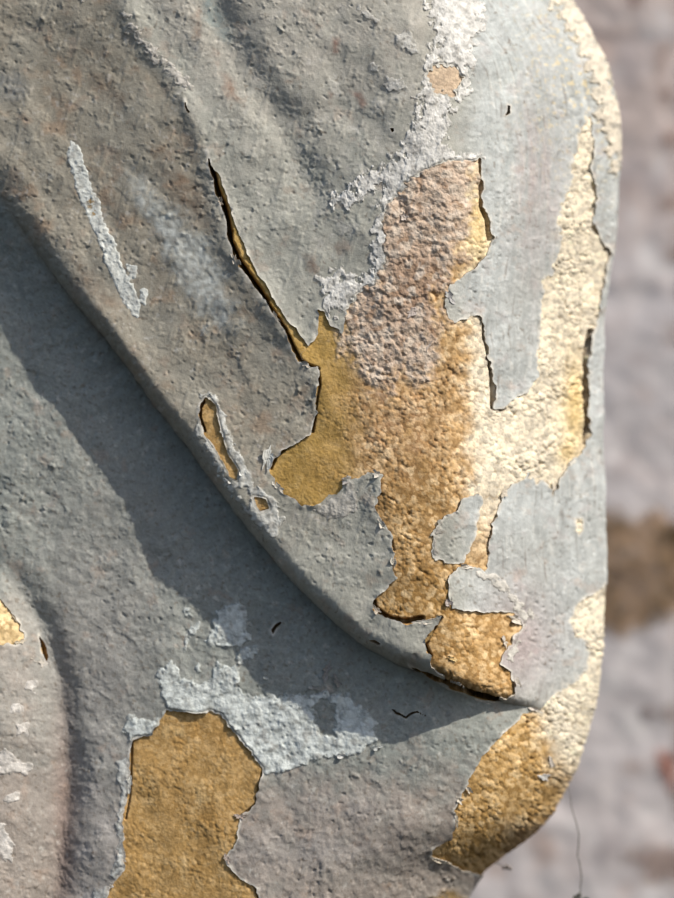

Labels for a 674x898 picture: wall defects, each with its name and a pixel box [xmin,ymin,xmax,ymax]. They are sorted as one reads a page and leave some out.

crack [208,158,310,368]
peeling [195,0,622,701]
peeling [0,600,26,645]
peeling [93,603,383,898]
peeling [432,508,674,876]